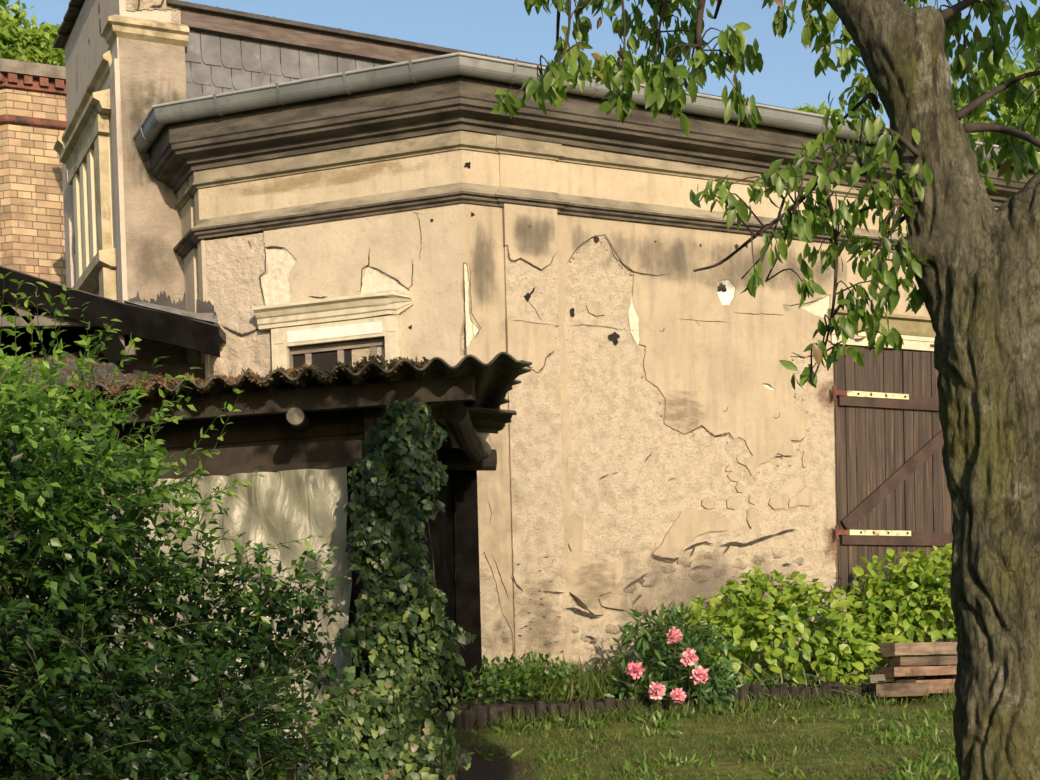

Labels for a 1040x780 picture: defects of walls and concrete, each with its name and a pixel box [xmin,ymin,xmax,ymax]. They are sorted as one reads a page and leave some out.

spalling [126,0,181,11]
spalling [205,233,297,381]
damp [516,224,545,254]
spalling [479,235,837,685]